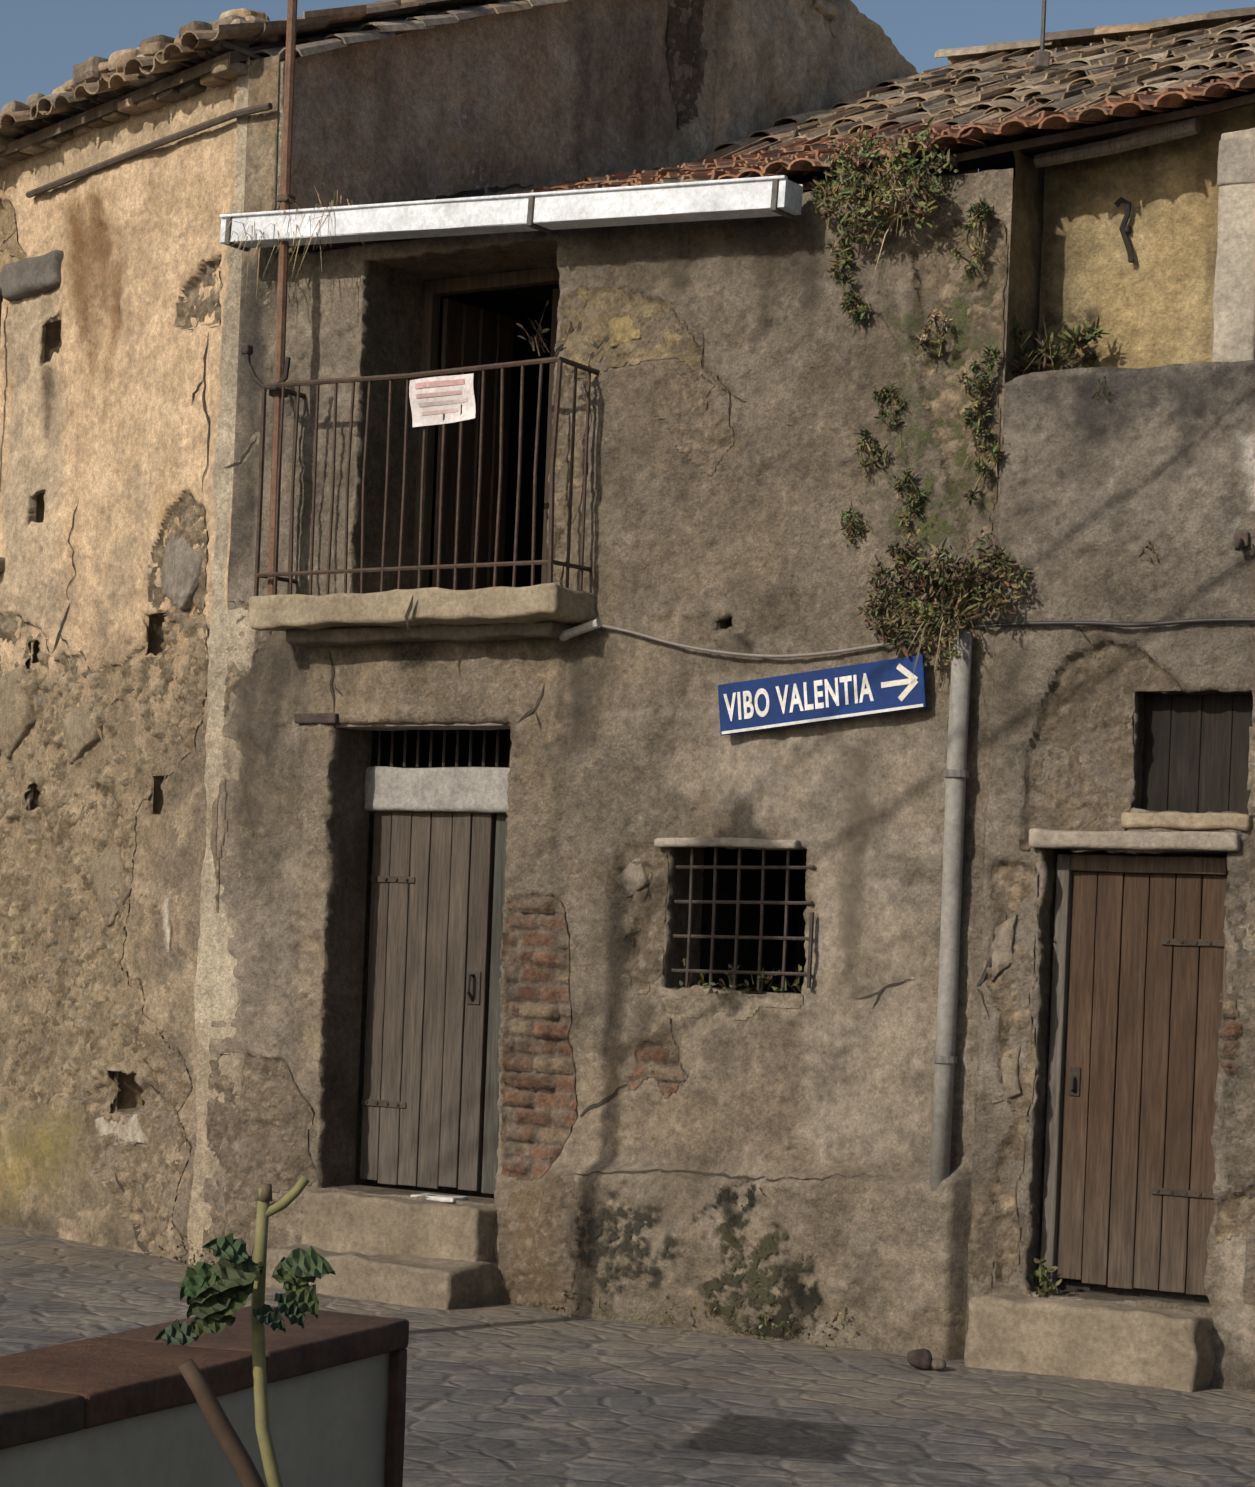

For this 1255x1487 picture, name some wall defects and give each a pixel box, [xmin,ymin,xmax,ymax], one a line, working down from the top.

spalling [44,320,62,363]
spalling [174,255,223,332]
crack [700,334,748,414]
flaking render [0,491,317,1265]
flaking render [605,842,803,1098]
flaking render [500,893,577,1180]
crack [560,1169,882,1198]
mould [571,1190,676,1295]
mould [692,1180,822,1339]